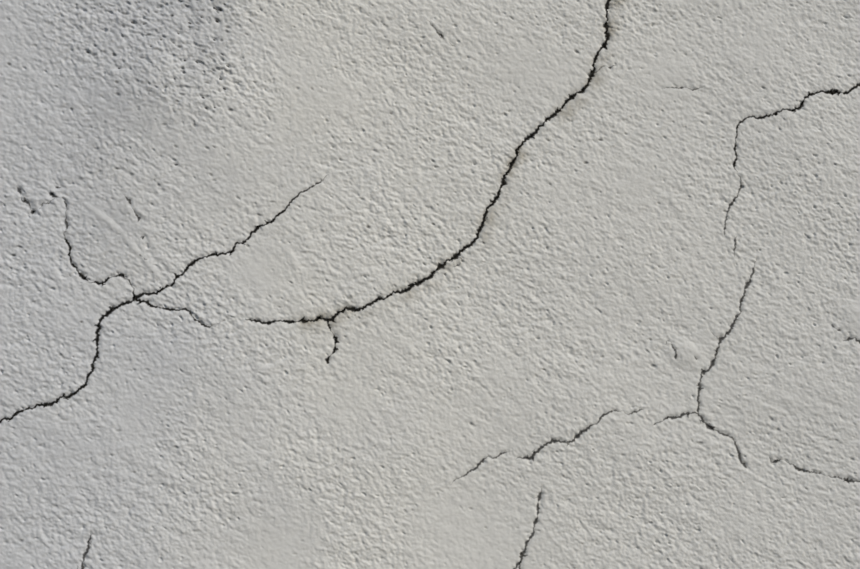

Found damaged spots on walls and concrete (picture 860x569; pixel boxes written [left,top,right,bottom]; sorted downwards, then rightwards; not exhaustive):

crack [249,0,611,364]
crack [724,83,860,250]
crack [0,182,321,423]
crack [514,493,541,569]
crack [464,269,754,476]
crack [773,459,860,482]